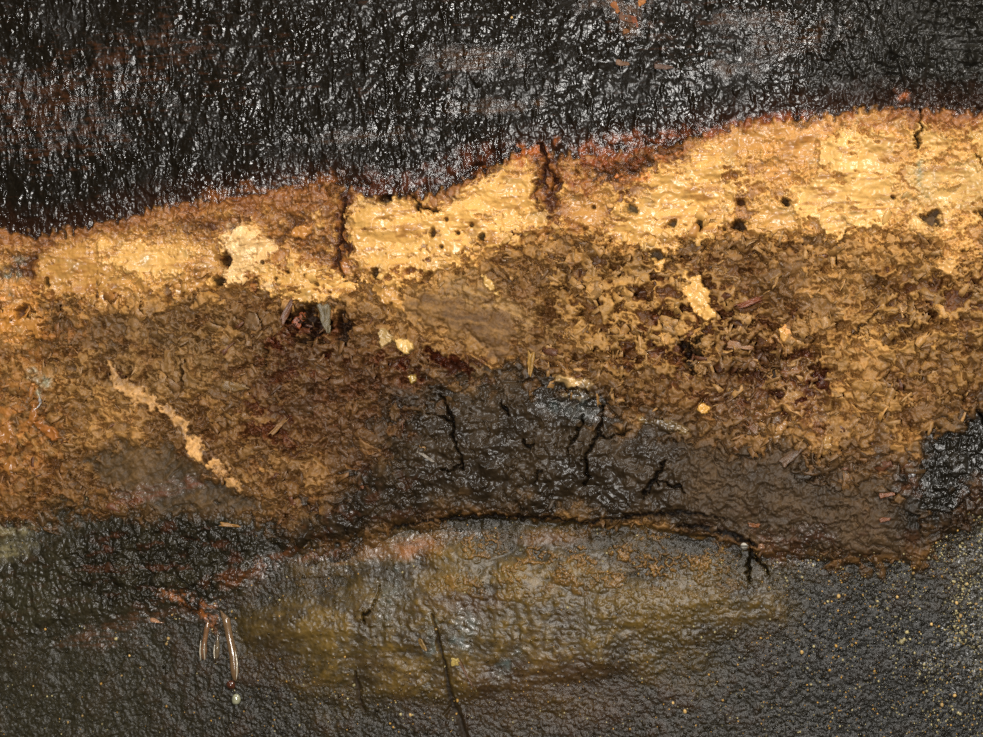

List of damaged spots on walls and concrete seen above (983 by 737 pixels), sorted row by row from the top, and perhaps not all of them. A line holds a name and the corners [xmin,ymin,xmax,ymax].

peeling [610,0,646,34]
crack [536,142,560,191]
corrosion [124,85,983,233]
crack [437,393,464,473]
crack [500,399,509,417]
crack [522,439,543,482]
crack [566,405,632,486]
crack [431,613,471,737]